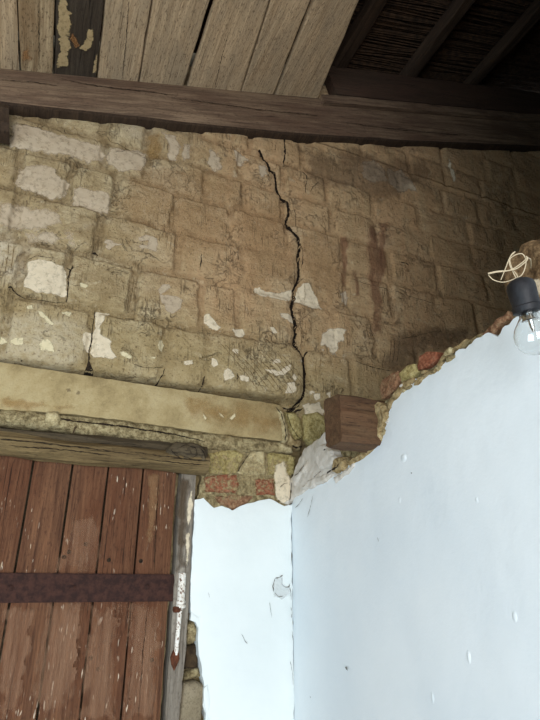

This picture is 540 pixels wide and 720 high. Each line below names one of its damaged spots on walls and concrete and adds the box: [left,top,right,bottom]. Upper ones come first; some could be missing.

peeling [57,0,93,68]
peeling [15,165,109,213]
peeling [24,259,67,297]
crack [258,139,317,413]
peeling [254,283,321,309]
crack [87,311,95,360]
peeling [82,312,132,376]
peeling [321,328,346,353]
peeling [223,368,249,382]
peeling [265,359,296,393]
spalling [380,351,444,400]
flaking render [186,391,355,561]